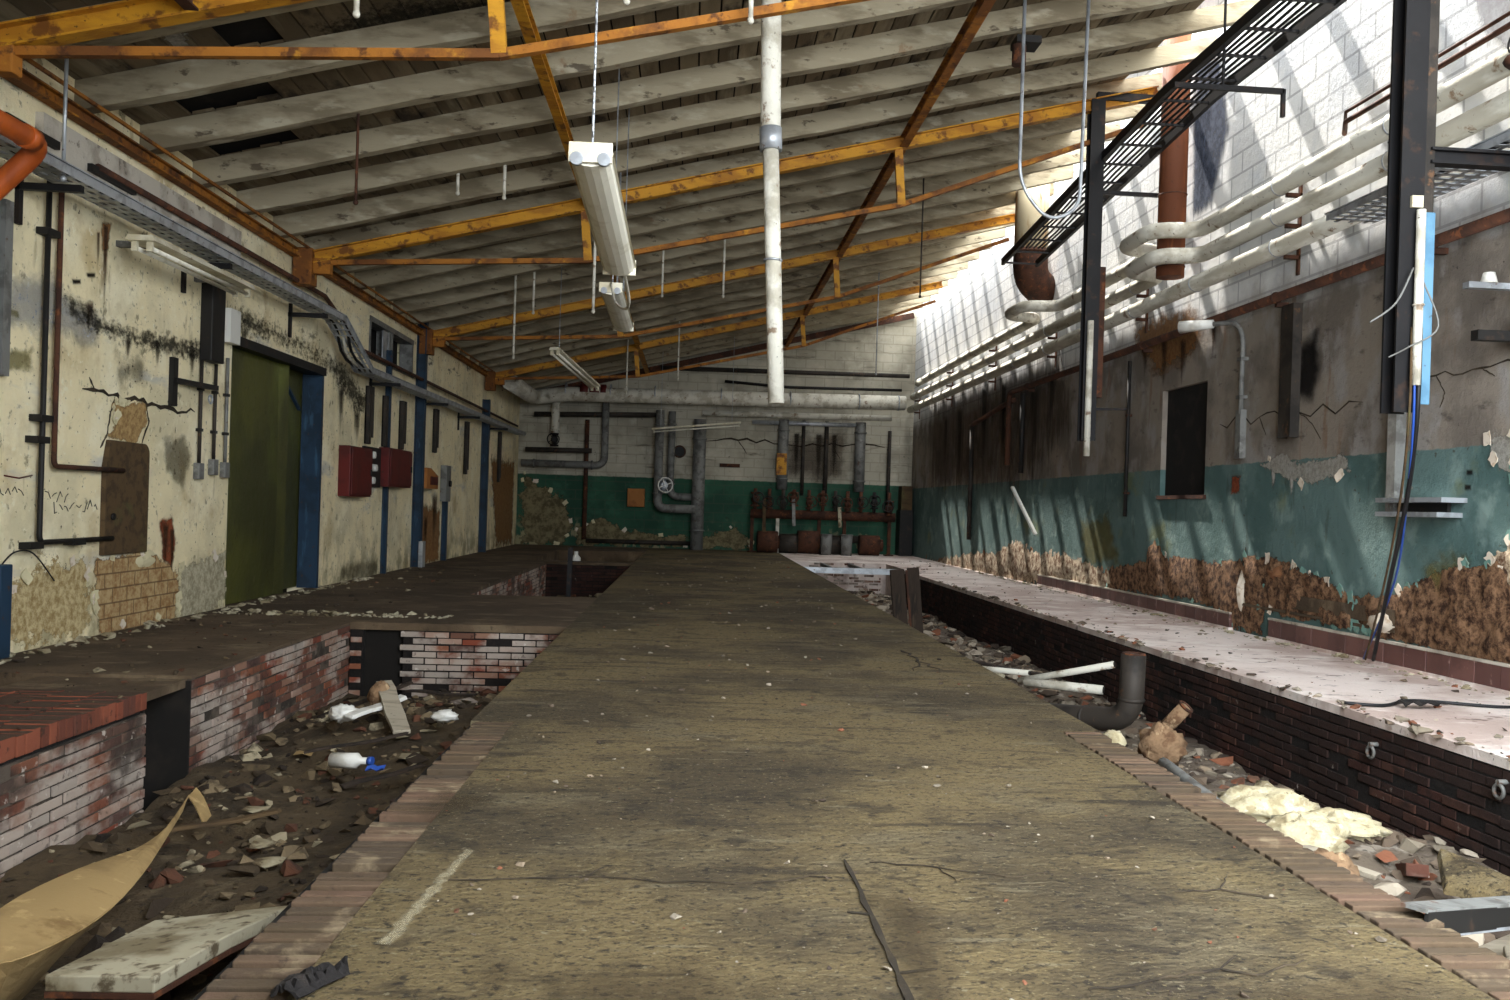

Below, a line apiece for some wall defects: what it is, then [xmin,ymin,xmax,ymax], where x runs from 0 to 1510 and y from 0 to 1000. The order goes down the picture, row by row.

water stain [65,296,200,365]
peeling [1260,453,1351,491]
peeling [1483,429,1510,484]
peeling [10,549,227,650]
spalling [926,530,1510,664]
spalling [904,574,1510,877]
crack [448,859,1048,1000]